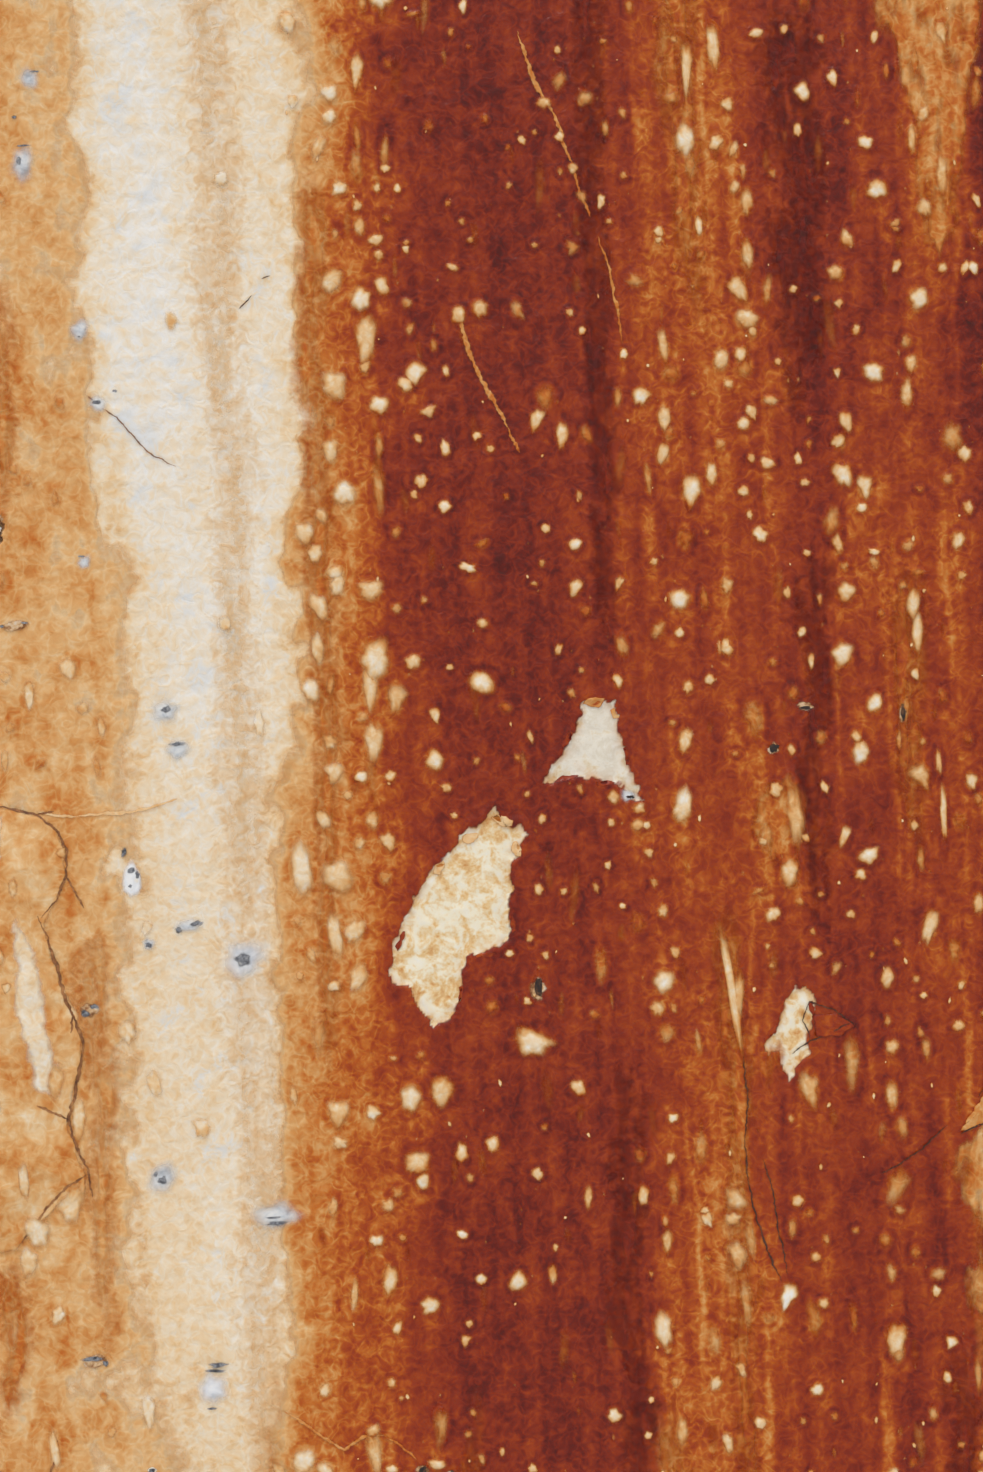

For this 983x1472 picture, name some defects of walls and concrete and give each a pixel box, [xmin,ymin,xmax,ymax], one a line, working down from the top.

crack [0,798,177,1243]
corrosion [0,0,184,1472]
peeling [388,806,528,1028]
peeling [543,697,642,801]
corrosion [235,0,983,1472]
peeling [764,985,855,1082]